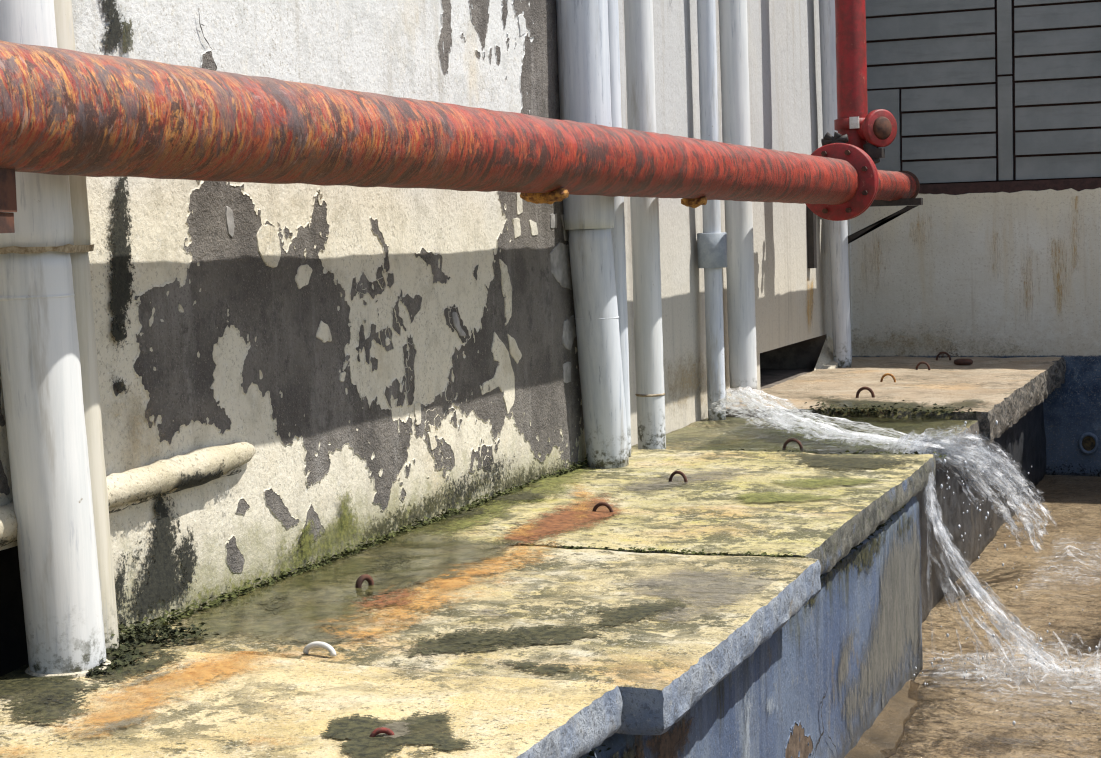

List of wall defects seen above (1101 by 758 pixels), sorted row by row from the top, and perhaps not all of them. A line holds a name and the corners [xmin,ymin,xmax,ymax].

peeling [437,0,560,120]
damp [105,177,136,352]
peeling [132,180,584,513]
peeling [235,497,250,516]
peeling [263,487,326,555]
damp [108,454,542,652]
corrosion [333,485,622,643]
corrosion [55,651,263,736]
damp [378,722,411,738]
spalling [784,720,813,758]